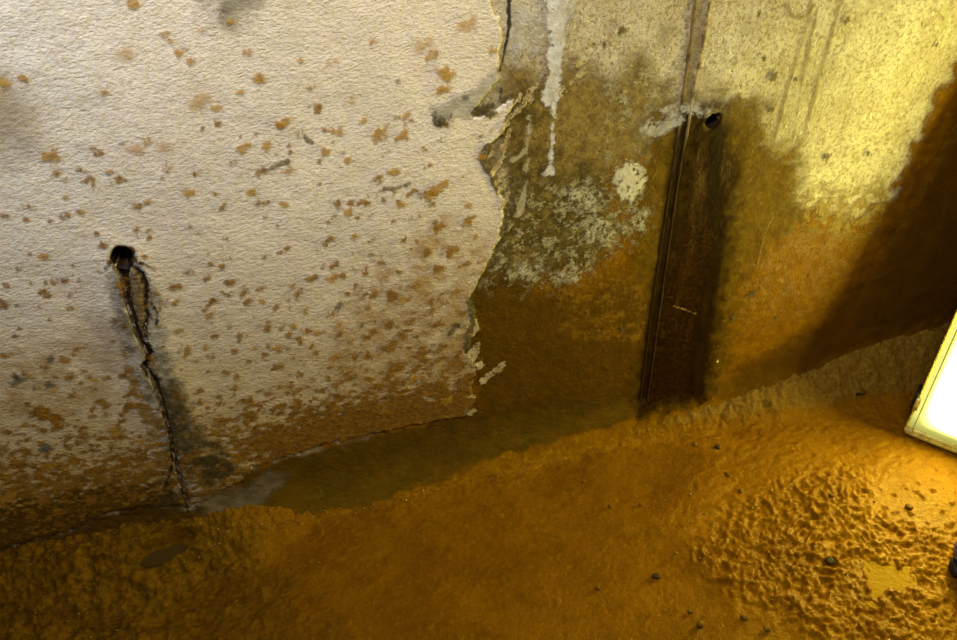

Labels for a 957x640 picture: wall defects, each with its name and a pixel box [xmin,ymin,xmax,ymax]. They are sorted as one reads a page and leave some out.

crack [104,254,191,512]
corrosion [161,31,193,65]
water stain [199,470,286,517]
flaking render [0,0,538,521]
corrosion [425,49,456,94]
corrosion [0,62,957,549]
crack [498,0,512,99]
water stain [470,0,711,306]